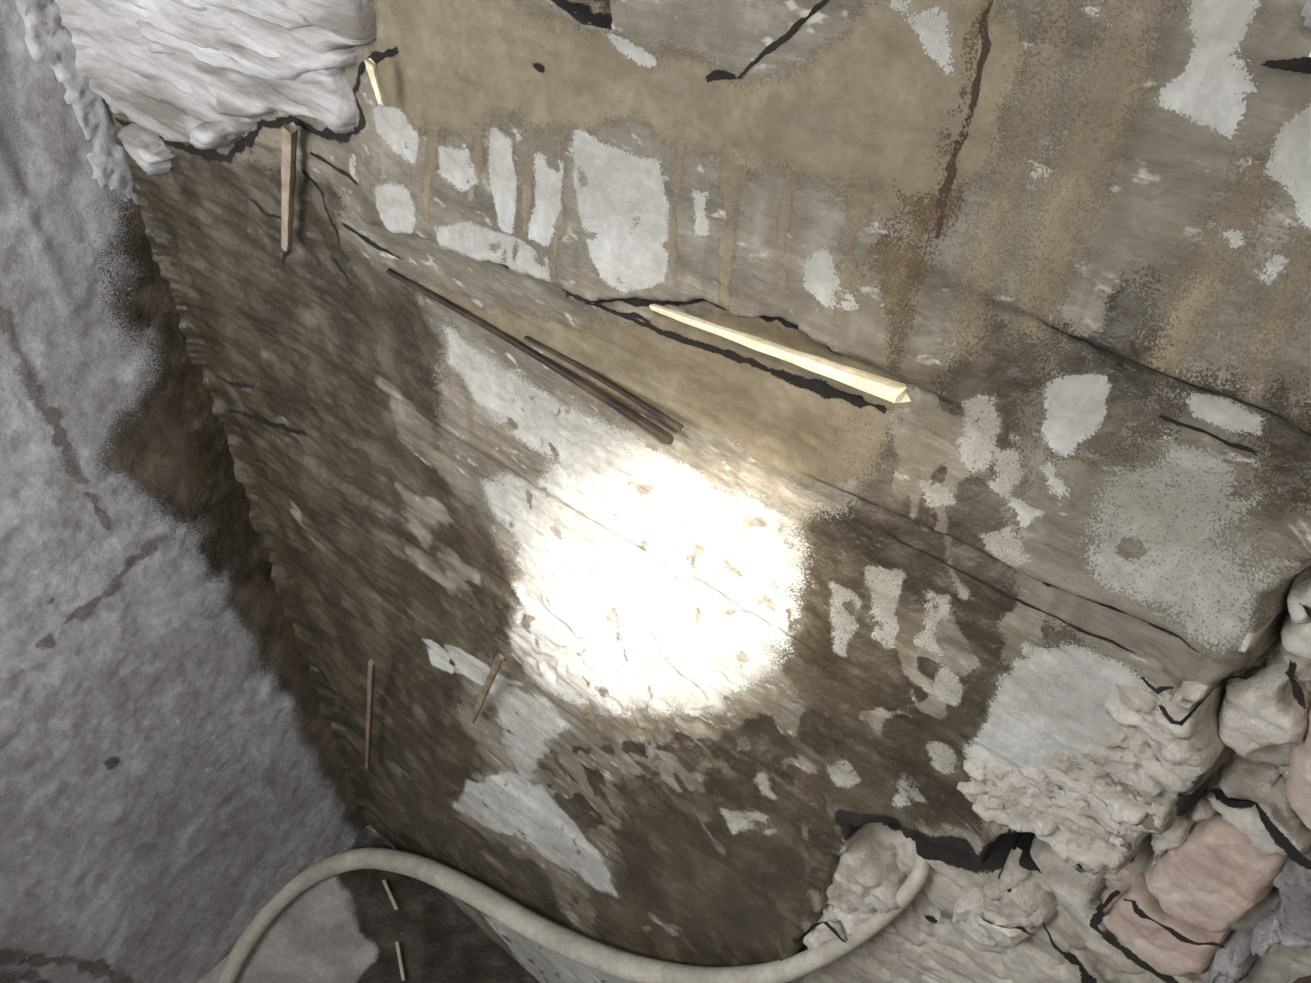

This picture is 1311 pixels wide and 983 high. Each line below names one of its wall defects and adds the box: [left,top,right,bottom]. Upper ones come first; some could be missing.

spalling [550,0,657,69]
crack [704,0,829,82]
corrosion [864,0,993,372]
leakage [33,633,56,649]
crack [0,307,112,531]
leakage [62,110,576,927]
crack [555,286,887,414]
leakage [537,0,1311,967]
flaking render [789,371,1311,983]
crack [886,516,1261,726]
leakage [0,946,134,983]
leakage [336,869,540,983]